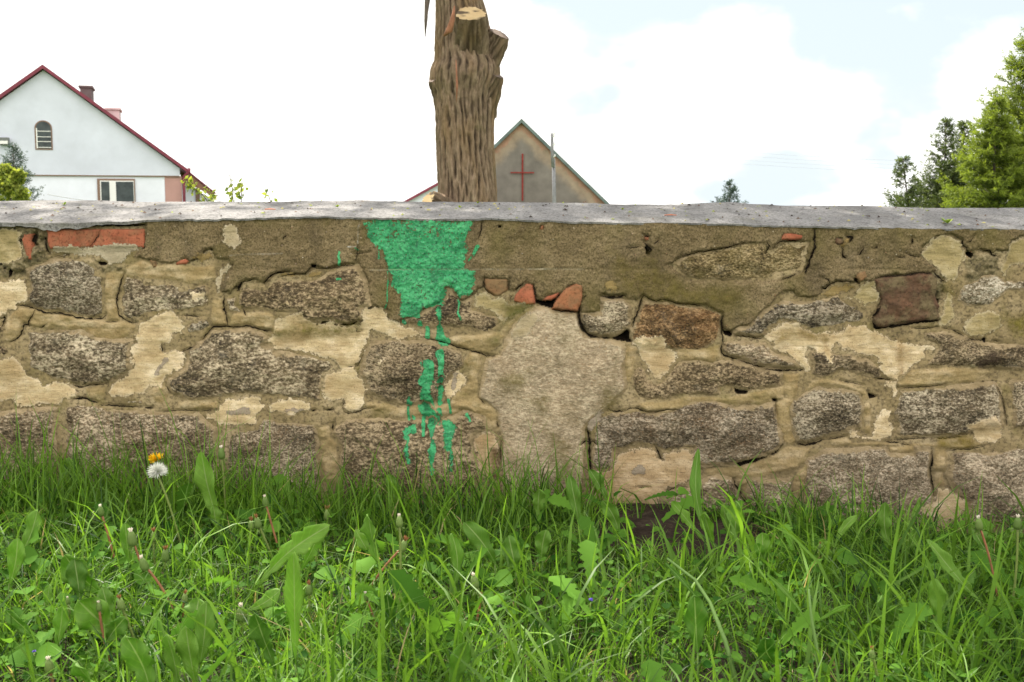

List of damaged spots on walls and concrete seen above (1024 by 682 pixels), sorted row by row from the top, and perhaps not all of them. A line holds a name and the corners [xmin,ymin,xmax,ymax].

flaking render [53,243,142,265]
crack [684,230,945,289]
crack [161,248,366,352]